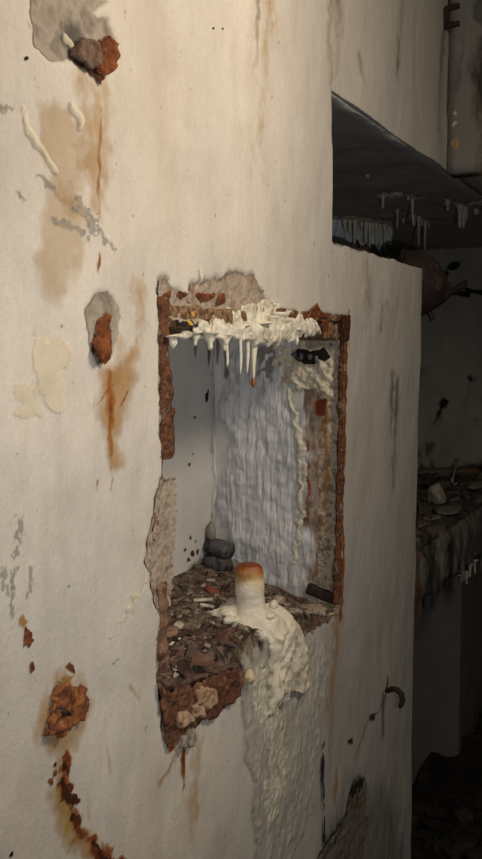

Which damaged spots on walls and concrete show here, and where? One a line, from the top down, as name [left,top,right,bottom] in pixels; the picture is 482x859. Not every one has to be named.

spalling [31,0,121,85]
spalling [86,291,121,365]
spalling [158,268,275,325]
rust [101,350,137,468]
spalling [126,477,177,616]
leakage [165,298,334,859]
rust [48,749,125,859]
rust [160,746,186,790]
crack [317,740,348,859]
crack [348,703,383,758]